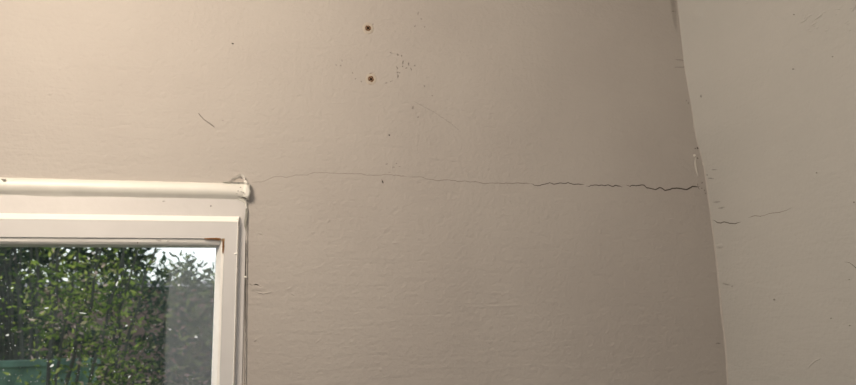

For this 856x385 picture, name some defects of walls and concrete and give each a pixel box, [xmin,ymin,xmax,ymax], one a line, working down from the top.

crack [251,172,700,192]
crack [241,236,249,385]